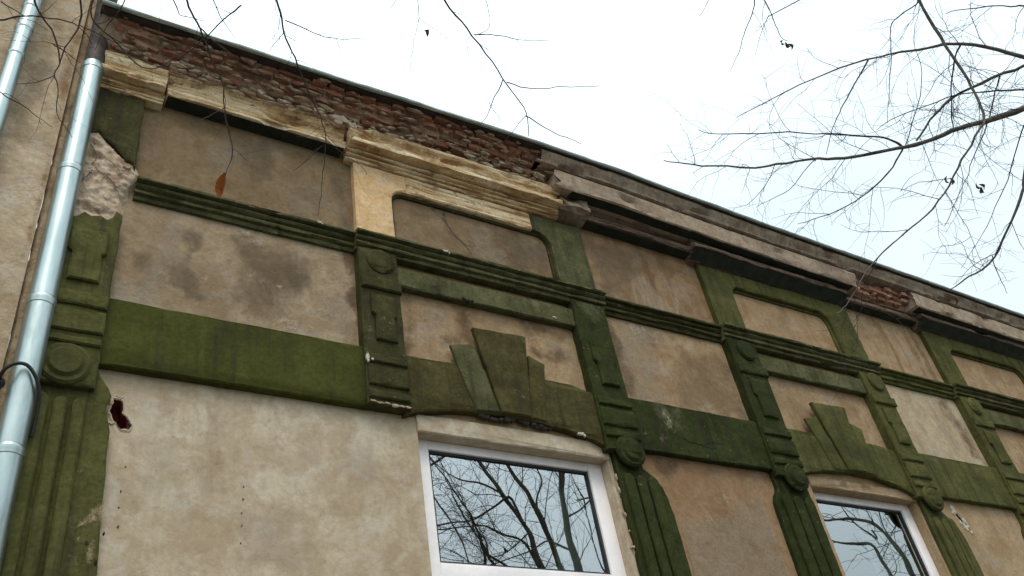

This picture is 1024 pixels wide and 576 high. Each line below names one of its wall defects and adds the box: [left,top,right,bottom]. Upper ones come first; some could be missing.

spalling [111,17,553,181]
spalling [74,133,138,220]
spalling [848,277,910,313]
spalling [106,395,133,433]